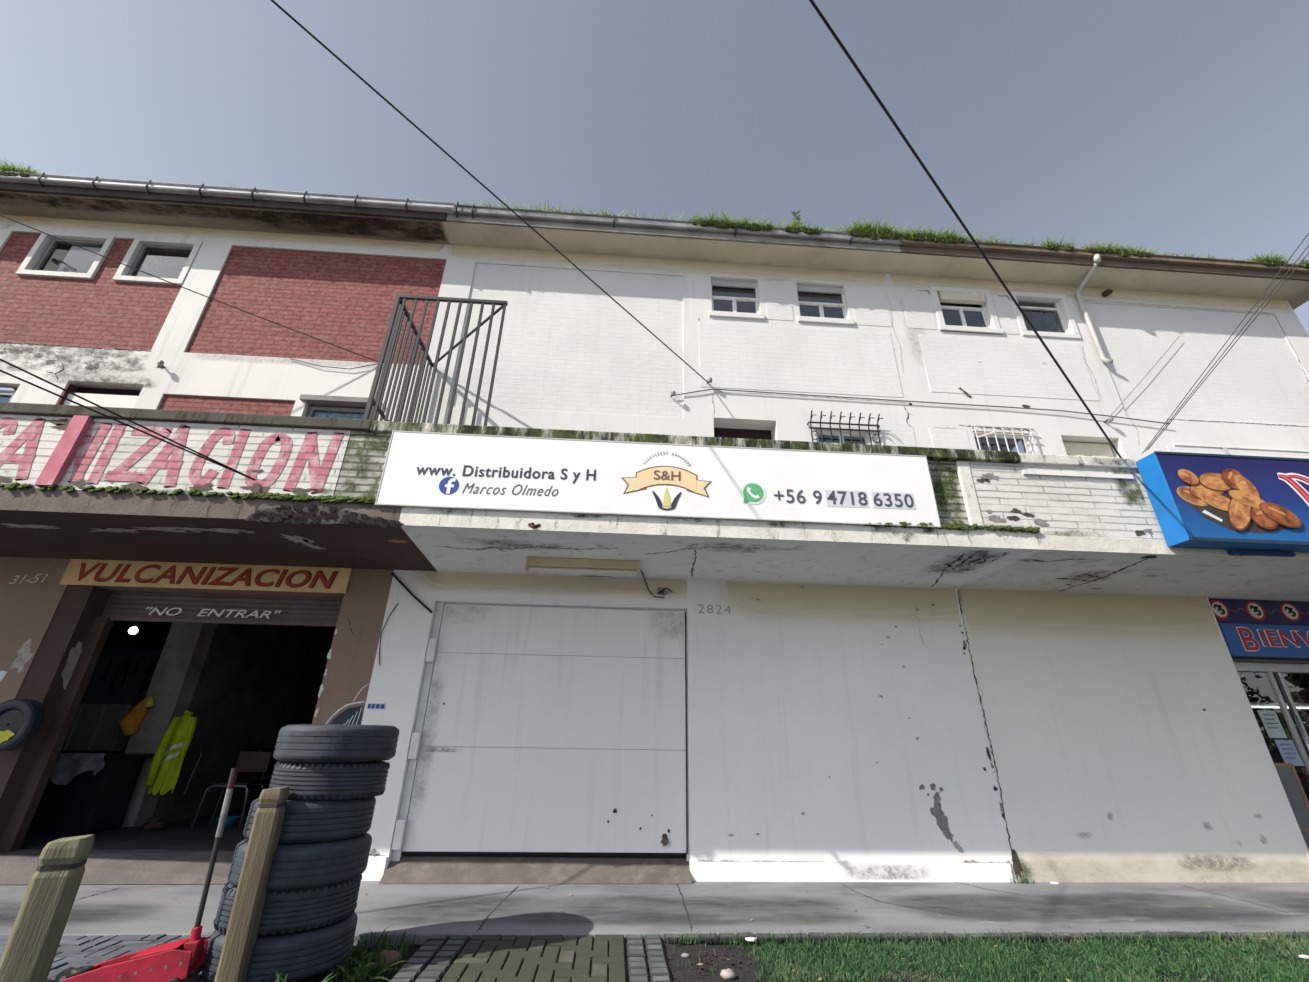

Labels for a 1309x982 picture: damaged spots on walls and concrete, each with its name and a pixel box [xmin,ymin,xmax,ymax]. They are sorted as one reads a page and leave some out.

leakage [1,345,150,387]
spalling [90,469,408,549]
leakage [935,467,960,513]
peeling [977,473,999,483]
peeling [986,508,1049,527]
leakage [736,551,1215,624]
crack [958,593,1021,876]
spalling [919,783,964,853]